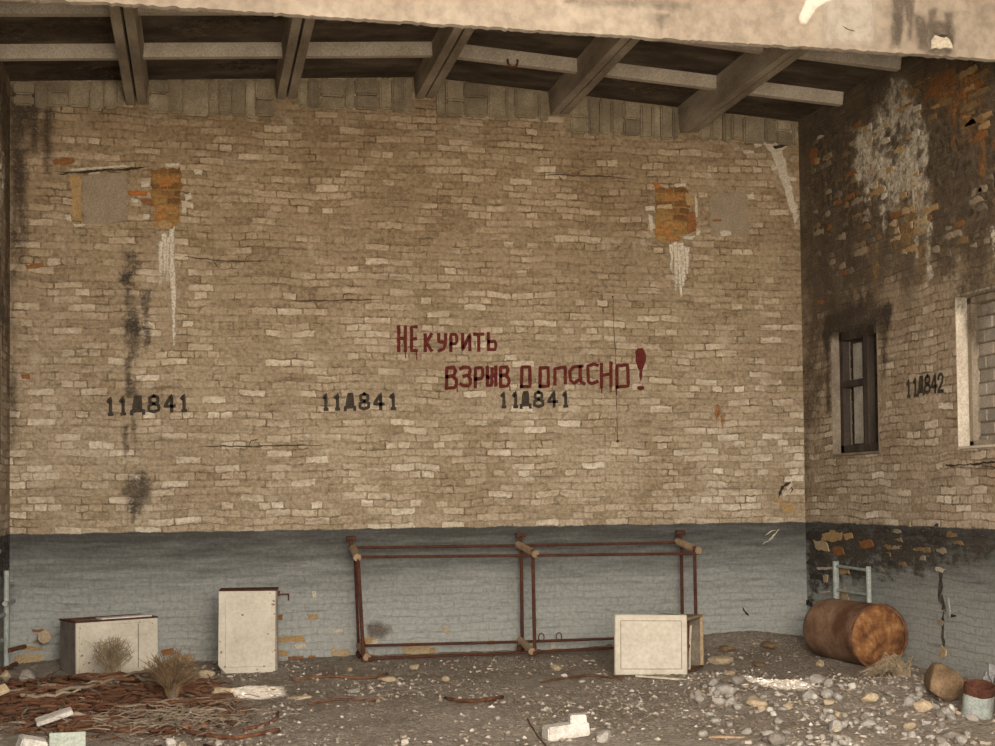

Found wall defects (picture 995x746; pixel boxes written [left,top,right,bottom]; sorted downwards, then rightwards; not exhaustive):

leakage [892,0,953,54]
leakage [17,94,52,231]
spalling [128,163,203,229]
spalling [645,183,701,242]
peeling [890,208,990,257]
peeling [969,173,994,212]
leakage [141,226,176,345]
leakage [669,242,690,297]
crack [946,460,995,468]
peeling [0,533,10,577]
peeling [806,522,995,659]